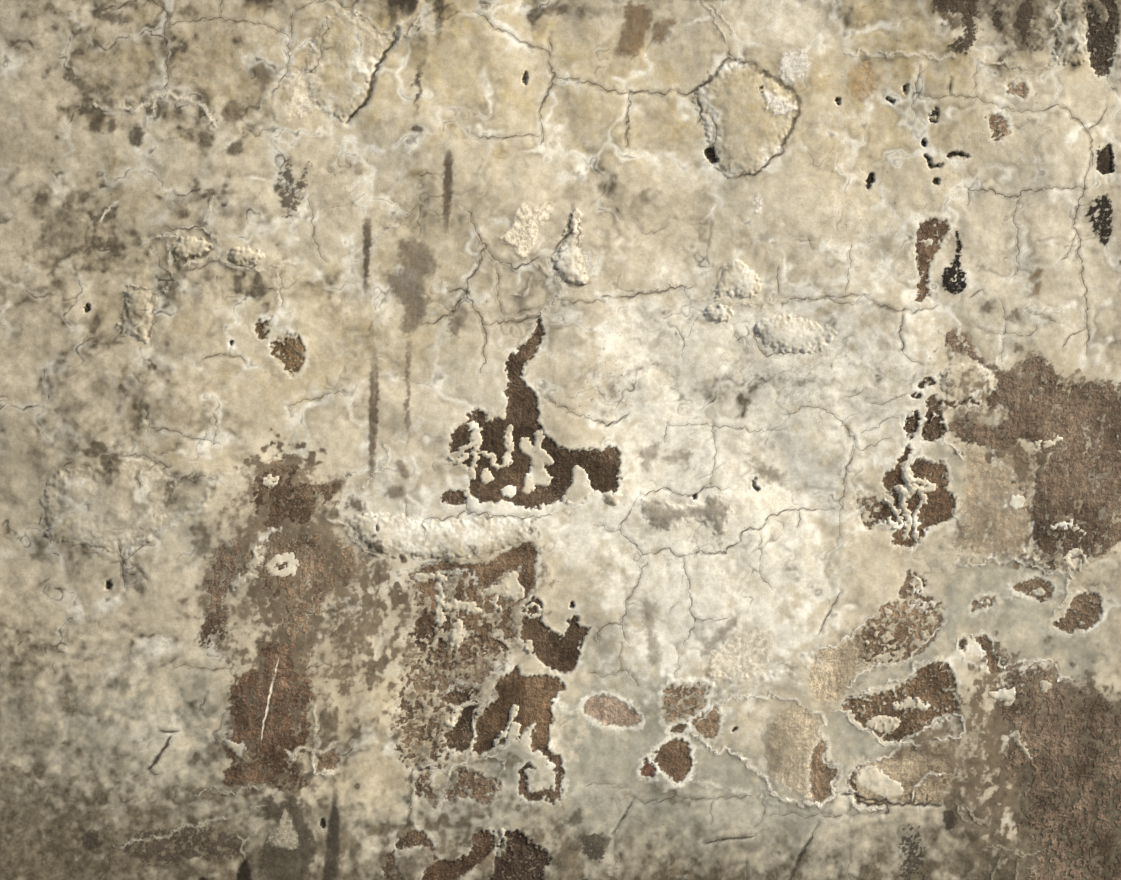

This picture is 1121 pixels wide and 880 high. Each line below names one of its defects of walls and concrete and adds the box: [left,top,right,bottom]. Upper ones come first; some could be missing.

crack [347,32,396,123]
leakage [350,0,424,43]
crack [479,14,801,177]
leakage [849,0,1036,61]
crack [427,210,689,372]
flaking render [436,314,626,513]
flaking render [199,441,357,791]
flaking render [377,541,727,880]
crack [593,392,907,685]
flaking render [803,329,1121,880]
leakage [956,631,1074,682]
leakage [943,807,991,831]